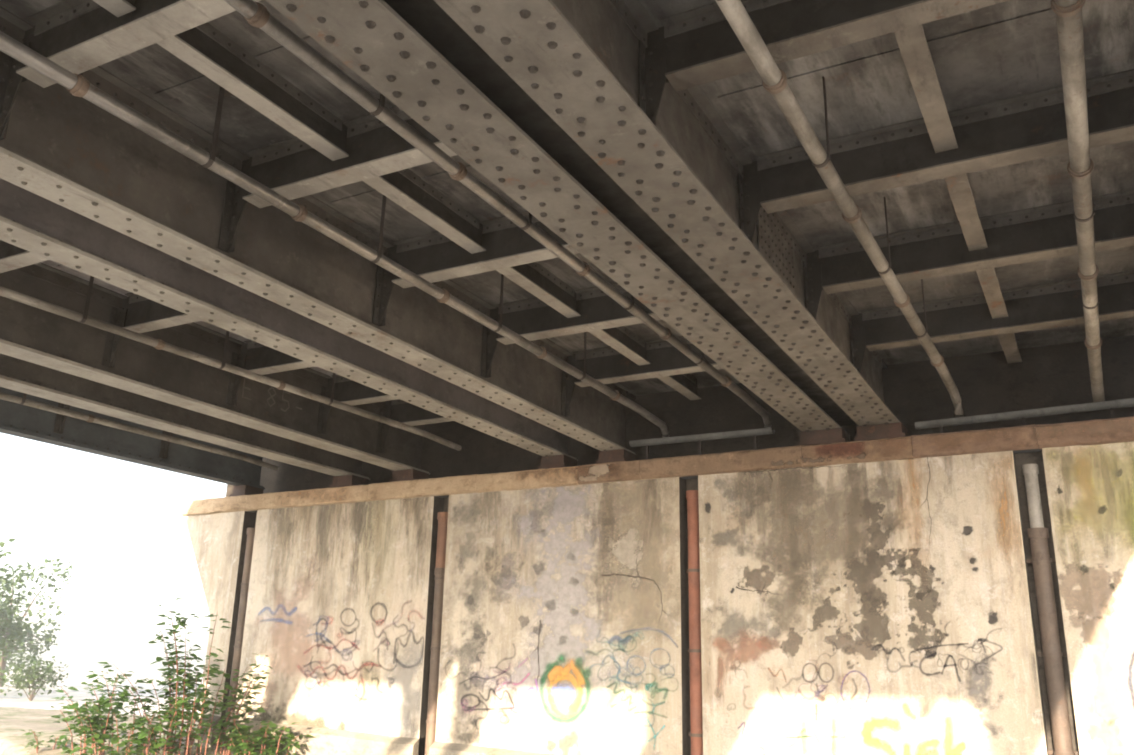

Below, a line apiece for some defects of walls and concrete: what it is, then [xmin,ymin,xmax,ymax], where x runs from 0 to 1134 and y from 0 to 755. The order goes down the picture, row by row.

rust [1032,419,1134,439]
crack [601,555,668,620]
spalling [730,565,781,594]
peeling [781,499,949,669]